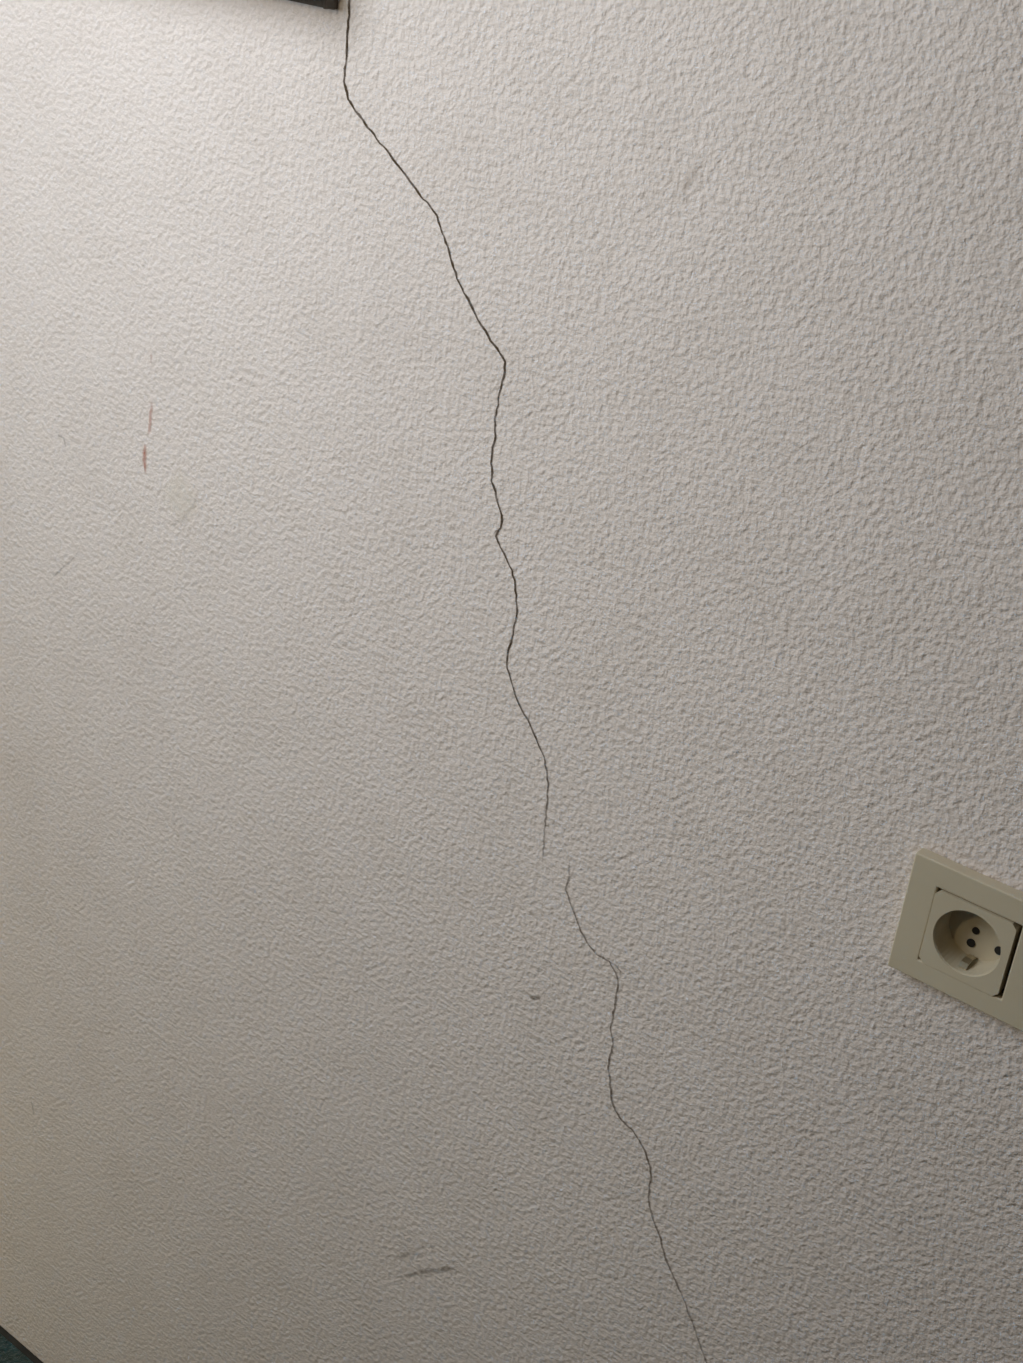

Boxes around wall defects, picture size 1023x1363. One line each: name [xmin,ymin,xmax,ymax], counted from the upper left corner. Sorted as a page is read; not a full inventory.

crack [343,0,549,826]
crack [566,883,687,1308]